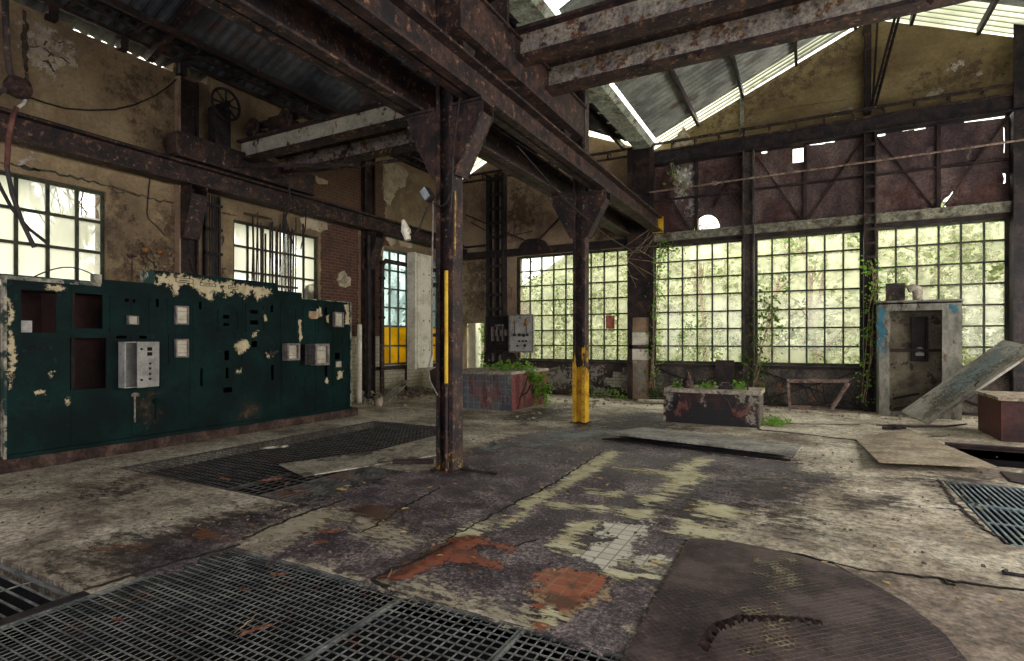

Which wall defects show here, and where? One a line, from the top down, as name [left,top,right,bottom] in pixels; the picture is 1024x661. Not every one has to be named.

crack [20,10,70,81]
flaking render [308,158,361,211]
peeling [371,150,409,218]
peeling [154,272,273,302]
flaking render [300,216,359,336]
flaking render [376,236,412,336]
peeling [5,298,18,390]
crack [778,550,1024,591]